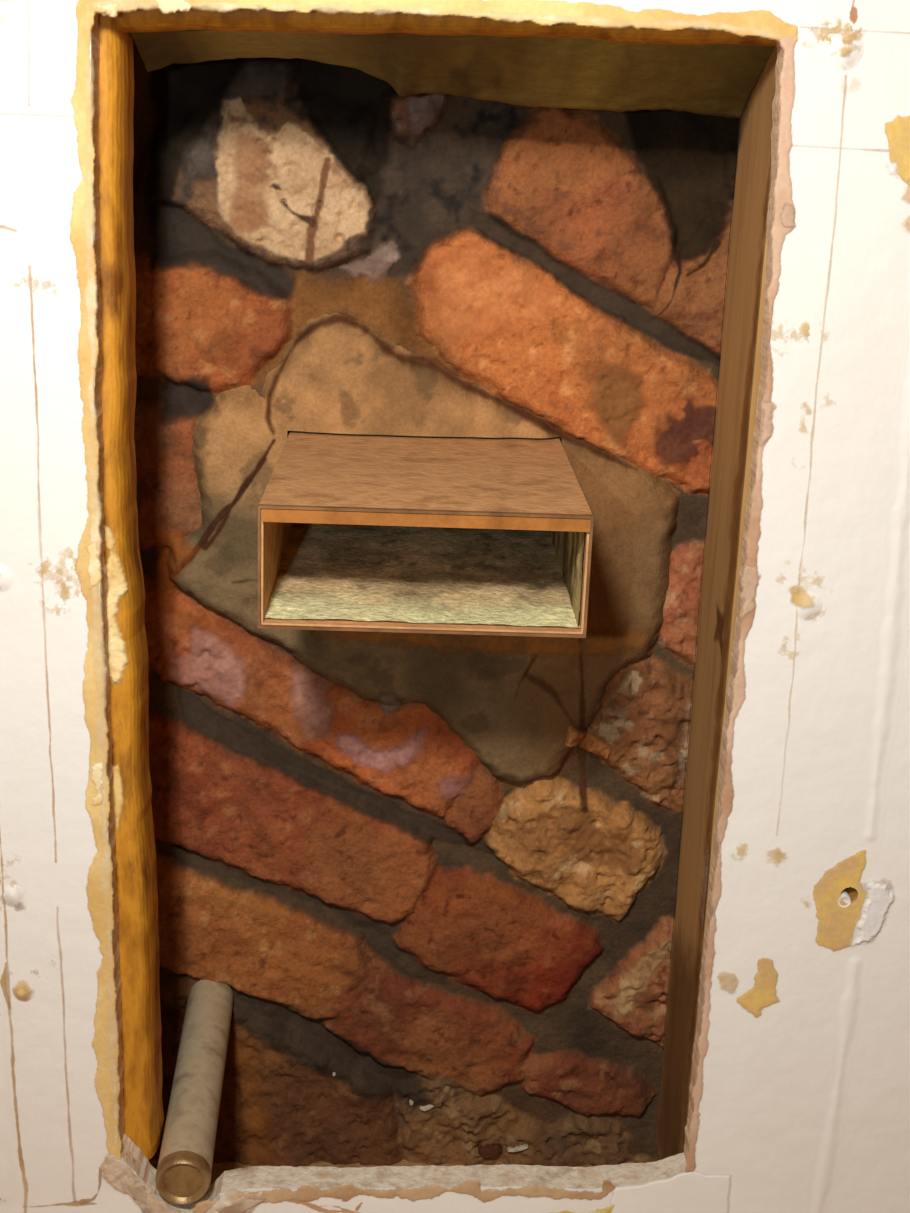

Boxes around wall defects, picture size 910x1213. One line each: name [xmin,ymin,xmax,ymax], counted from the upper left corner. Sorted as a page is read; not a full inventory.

flaking render [885,116,910,202]
crack [30,276,39,438]
peeling [70,0,798,1213]
crack [46,672,56,862]
crack [521,654,588,813]
crack [0,839,10,1008]
flaking render [813,850,895,951]
crack [11,1047,102,1207]